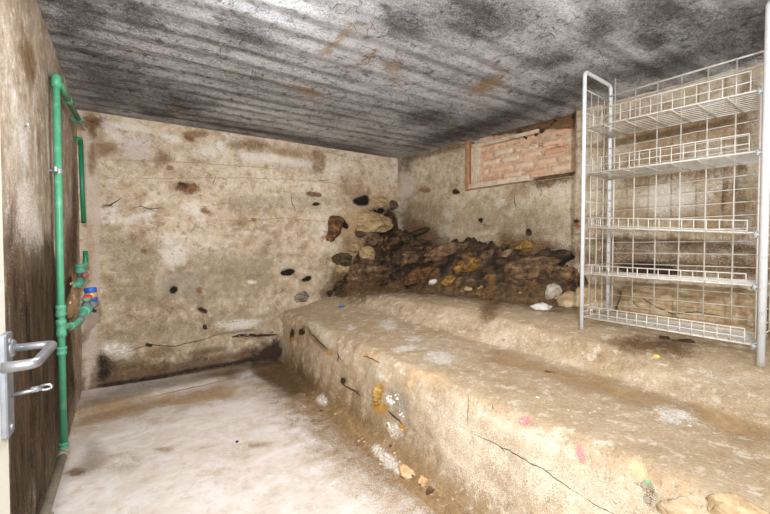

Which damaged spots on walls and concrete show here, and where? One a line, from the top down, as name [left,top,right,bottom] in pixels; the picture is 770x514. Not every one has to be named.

leakage [20,34,38,92]
leakage [38,0,766,286]
leakage [2,101,302,514]
crack [232,331,278,340]
crack [306,326,360,396]
crack [424,398,613,514]